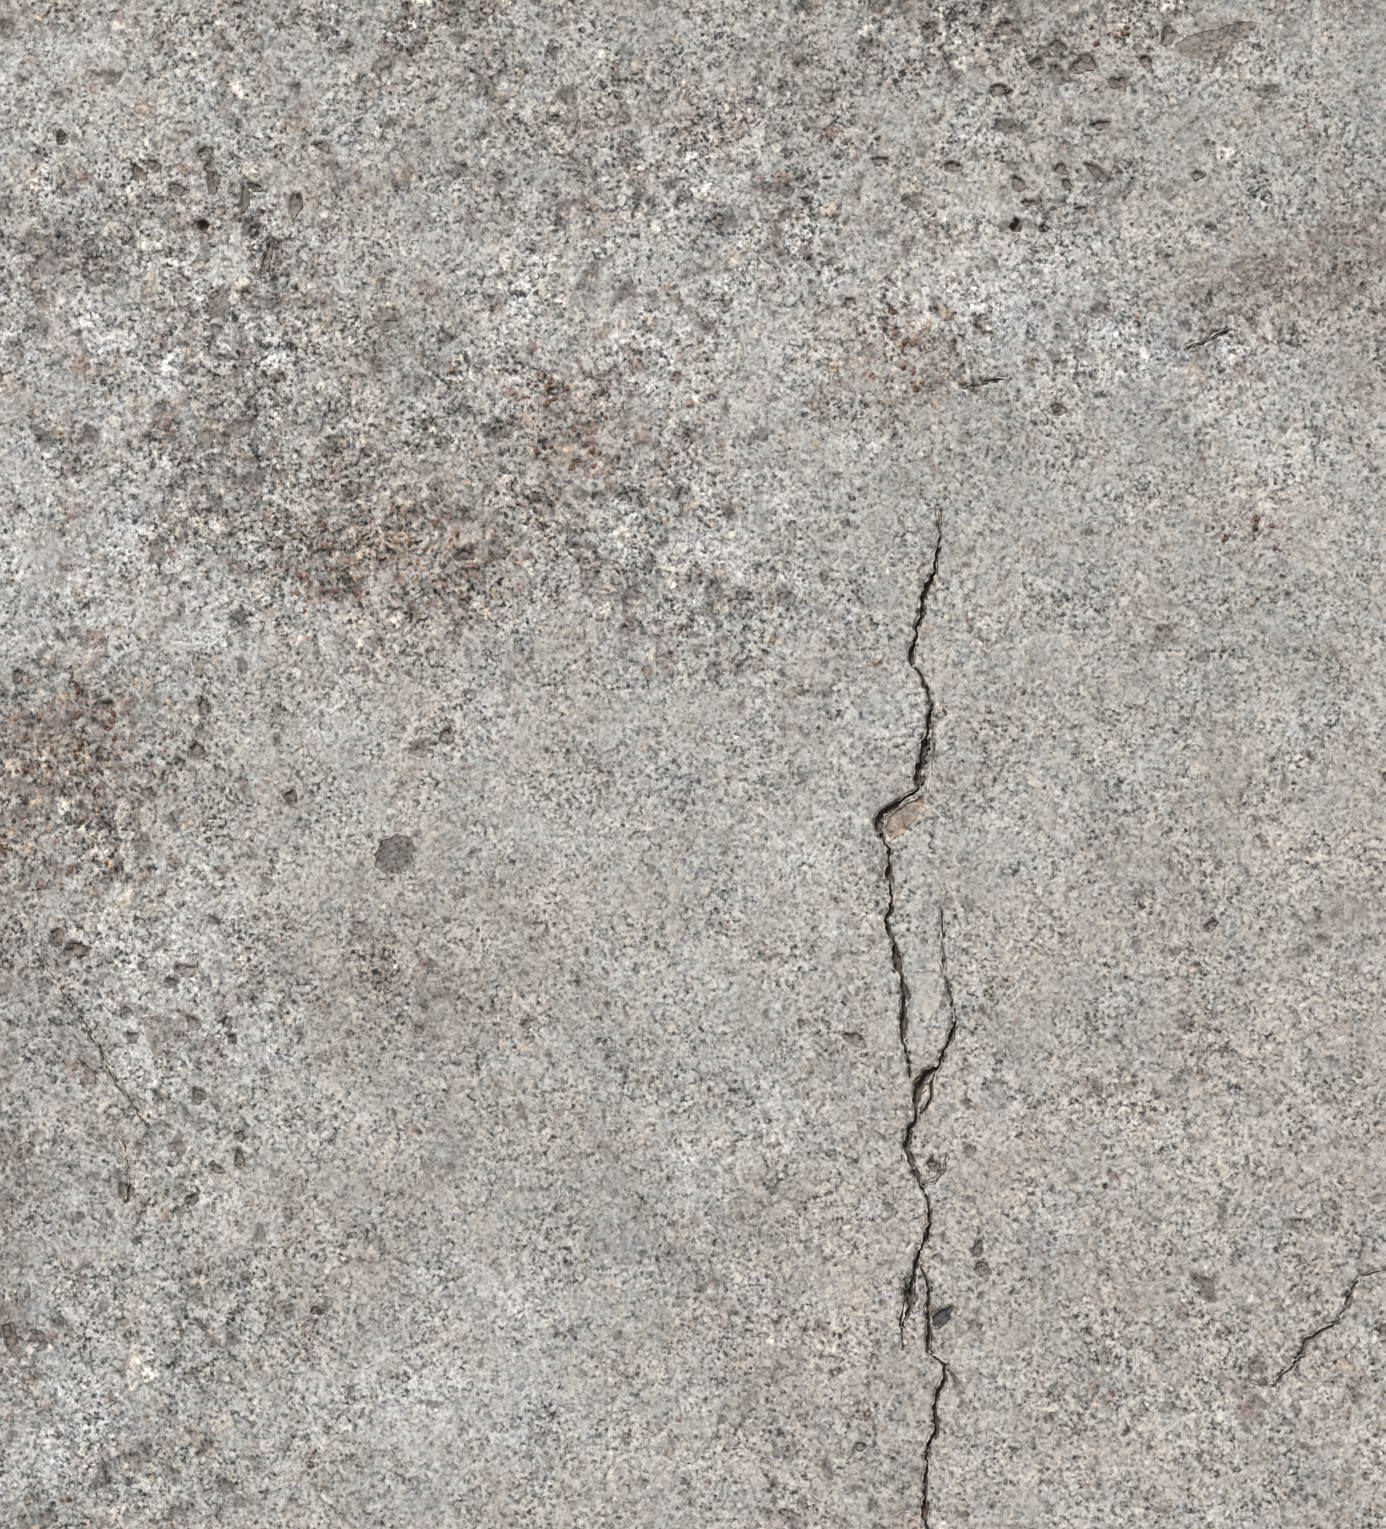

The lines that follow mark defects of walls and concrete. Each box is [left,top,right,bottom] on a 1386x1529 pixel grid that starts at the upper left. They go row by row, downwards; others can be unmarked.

crack [864,506,965,1529]
crack [1251,1269,1386,1388]